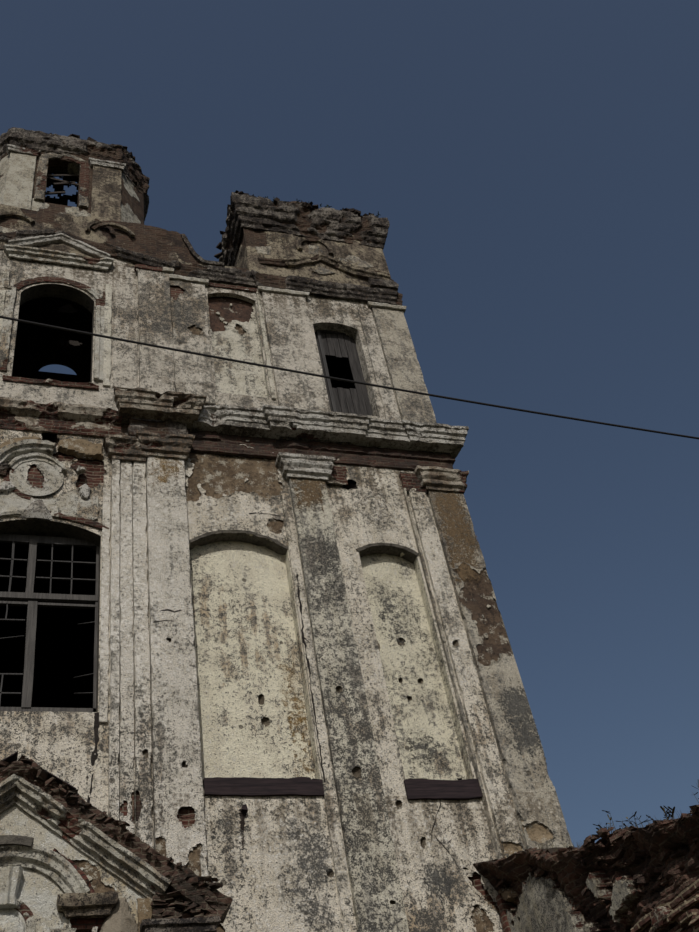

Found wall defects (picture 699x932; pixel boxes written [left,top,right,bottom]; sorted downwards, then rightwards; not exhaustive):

spalling [185,297,255,336]
spalling [25,462,48,491]
spalling [41,433,109,489]
peeling [451,556,514,669]
crack [296,574,325,782]
damp [497,678,547,764]
spalling [500,818,556,857]
spalling [67,918,106,932]
peeling [65,854,126,898]
peeling [458,864,645,932]